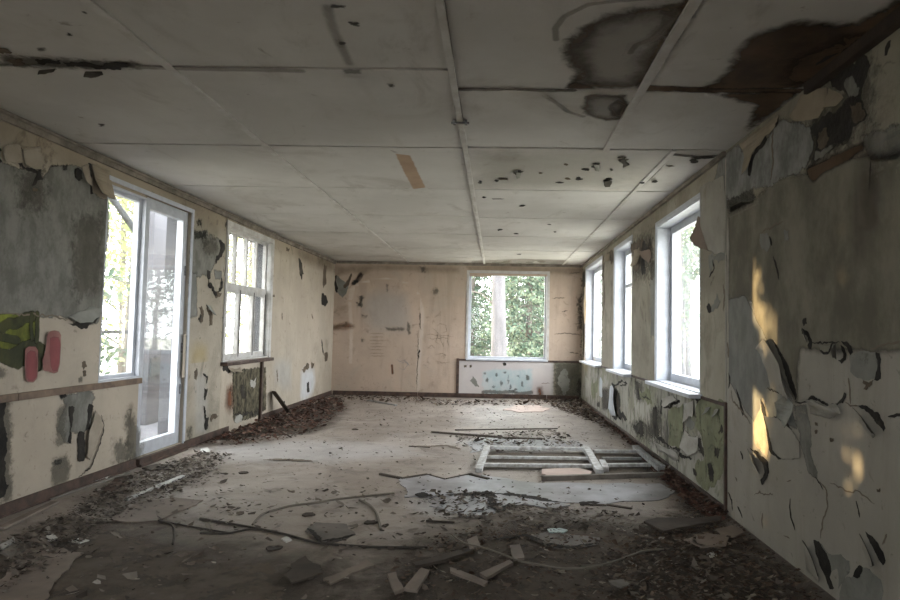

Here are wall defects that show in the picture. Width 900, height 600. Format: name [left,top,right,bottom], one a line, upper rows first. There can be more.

peeling [0,48,137,78]
leakage [458,0,900,128]
peeling [555,156,629,187]
peeling [0,144,116,329]
peeling [188,231,225,326]
peeling [321,264,352,306]
peeling [690,55,900,489]
crack [414,313,422,391]
peeling [57,391,104,477]
peeling [585,376,627,421]
peeling [679,400,698,456]
peeling [803,532,887,600]